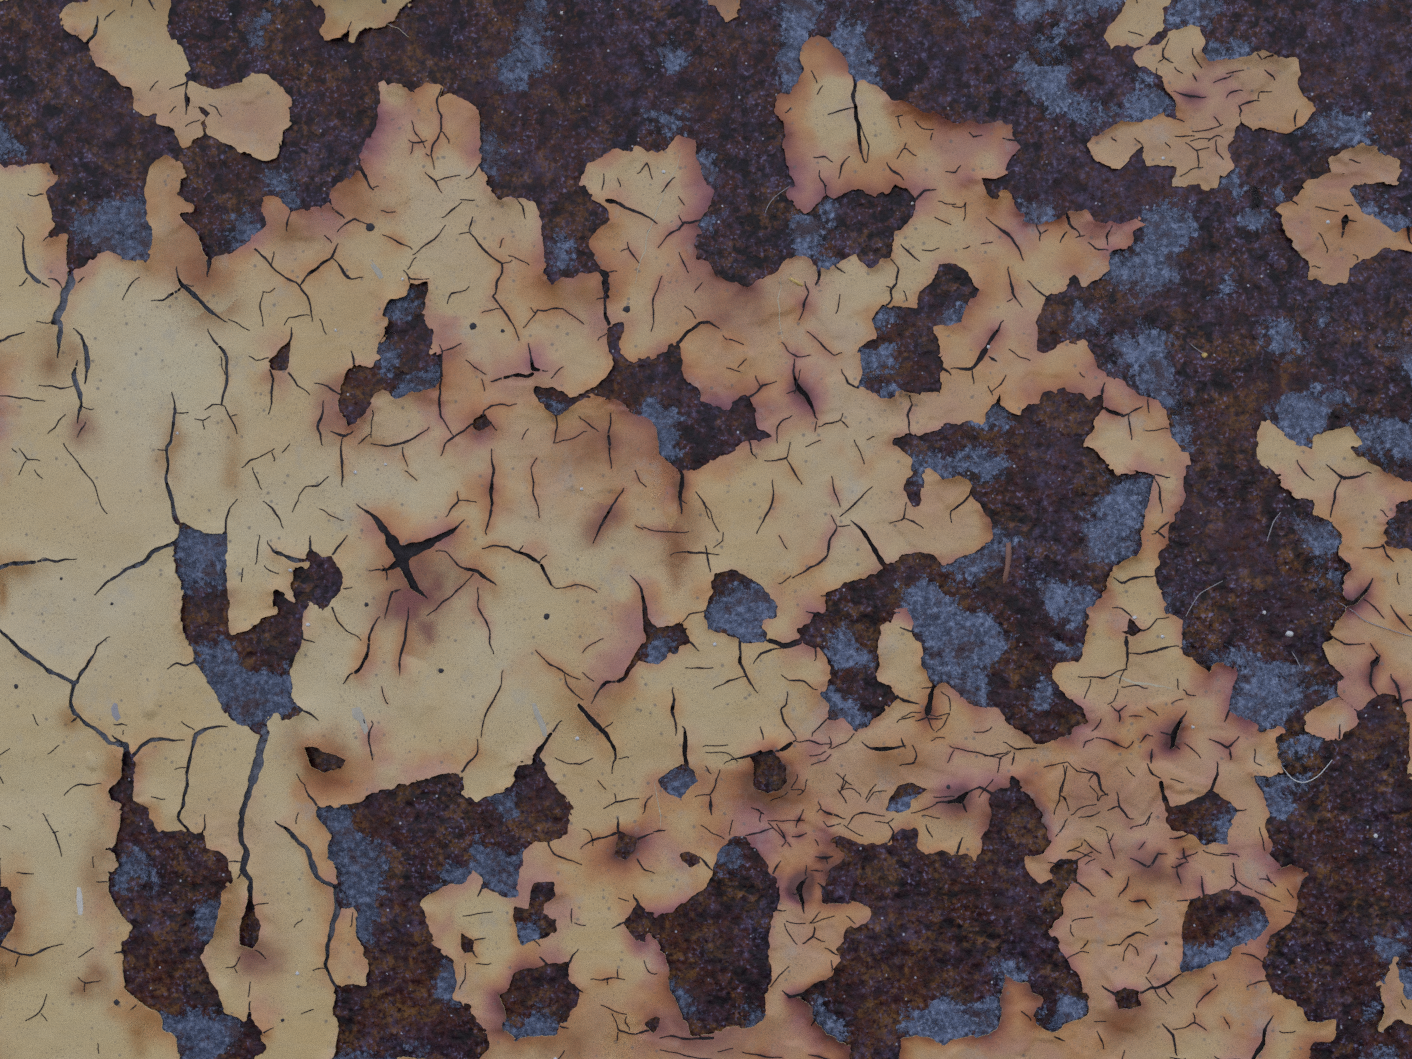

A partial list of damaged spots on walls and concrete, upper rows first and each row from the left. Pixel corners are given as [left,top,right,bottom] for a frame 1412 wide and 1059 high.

crack [1111,0,1297,177]
crack [0,193,108,514]
peeling [172,514,343,742]
rust [300,739,343,774]
crack [94,70,1299,1059]
peeling [795,387,1154,744]
crack [1297,460,1371,518]
crack [1332,509,1412,706]
peeling [106,750,266,1059]
peeling [316,748,579,1059]
peeling [624,836,780,1039]
peeling [801,776,1089,1059]